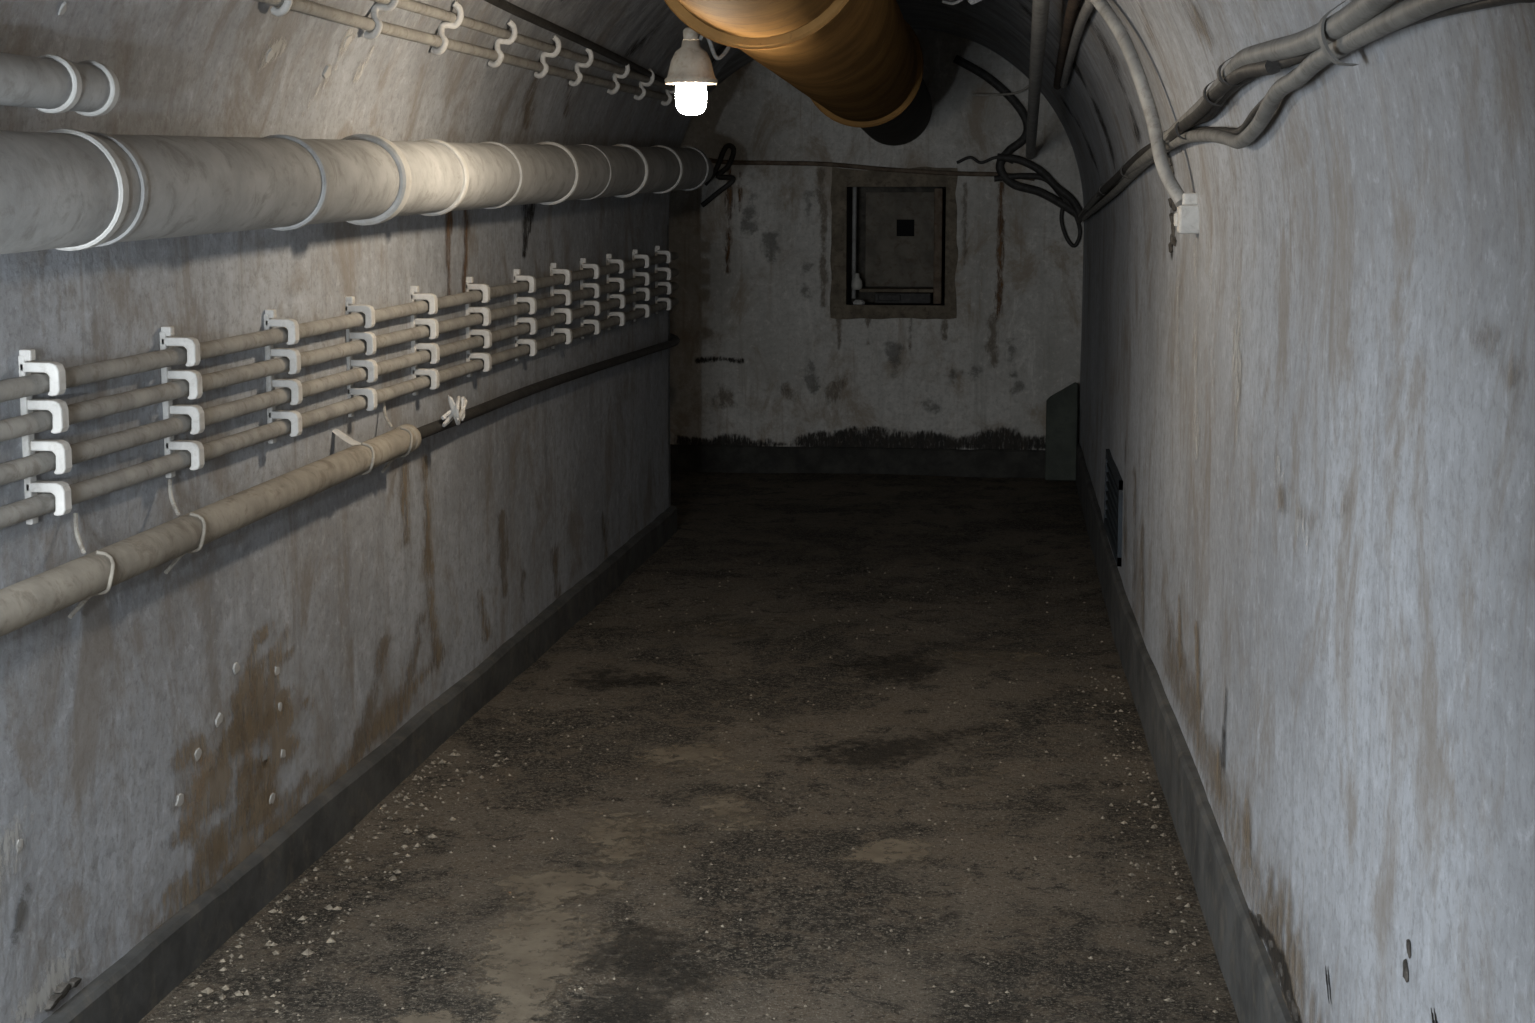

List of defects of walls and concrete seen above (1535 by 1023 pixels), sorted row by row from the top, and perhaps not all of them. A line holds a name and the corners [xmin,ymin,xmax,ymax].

water stain [676,426,1046,450]
water stain [300,455,445,810]
water stain [1165,597,1313,1023]
peeling [1403,939,1411,983]